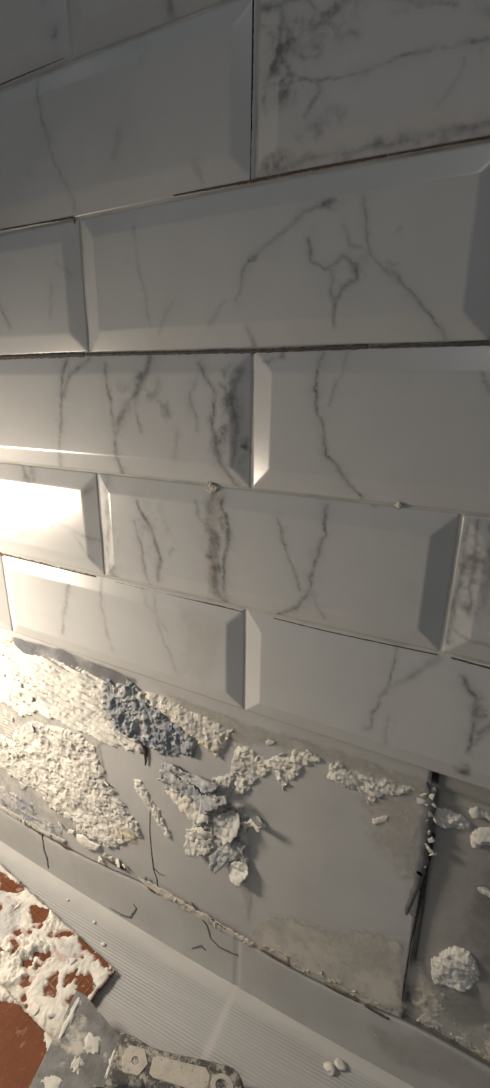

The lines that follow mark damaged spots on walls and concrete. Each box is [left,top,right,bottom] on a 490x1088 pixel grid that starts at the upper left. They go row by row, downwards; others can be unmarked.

peeling [98,842,126,868]
peeling [411,787,437,868]